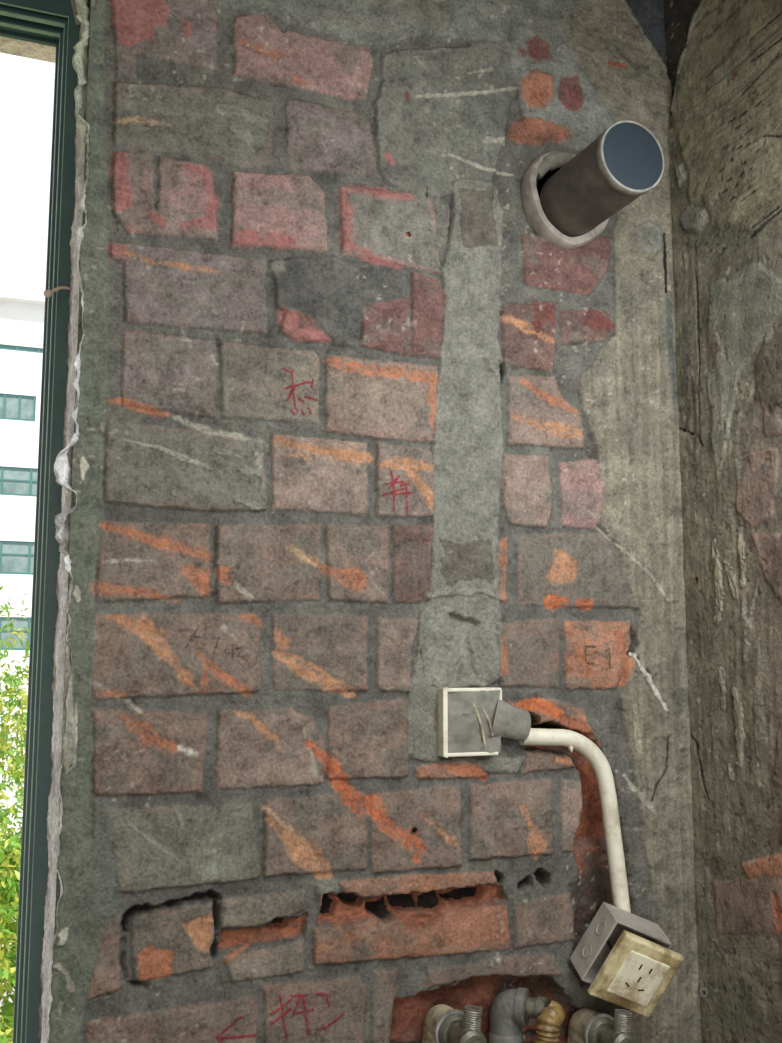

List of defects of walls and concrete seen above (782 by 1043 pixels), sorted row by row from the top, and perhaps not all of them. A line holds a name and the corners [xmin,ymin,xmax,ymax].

crack [740,10,782,97]
crack [762,132,782,140]
crack [749,204,782,240]
spalling [260,804,336,881]
spalling [181,882,509,964]
spalling [136,944,177,982]